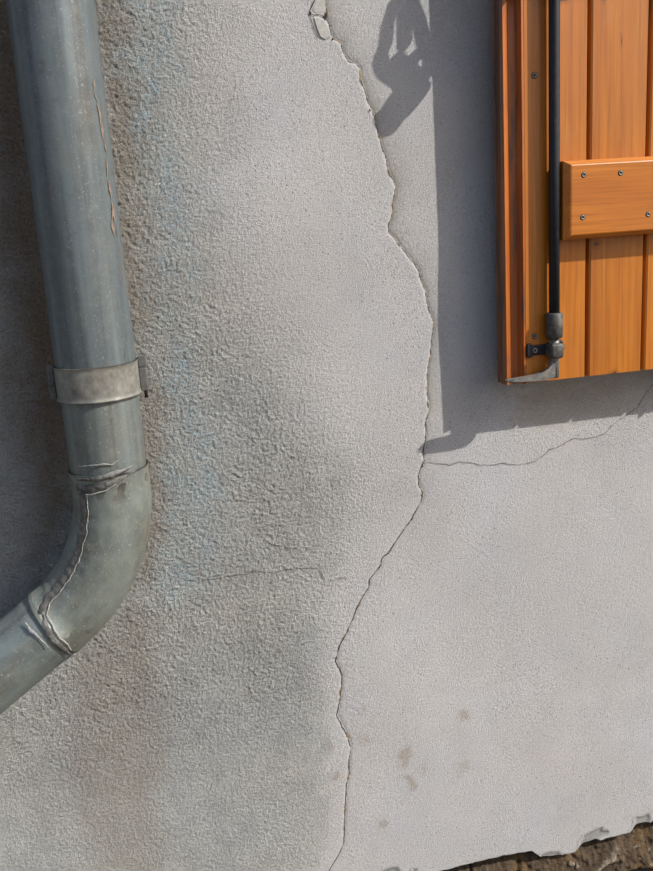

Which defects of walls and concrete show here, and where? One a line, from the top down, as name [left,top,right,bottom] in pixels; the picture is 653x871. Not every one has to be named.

crack [309,0,649,871]
crack [188,538,345,581]
spalling [577,826,611,849]
spalling [631,812,652,831]